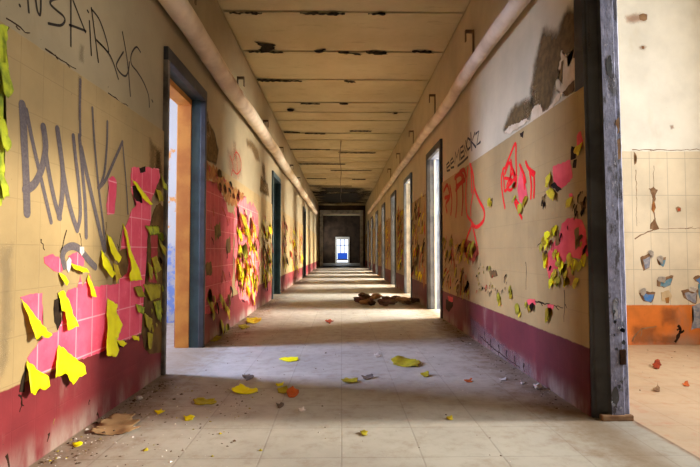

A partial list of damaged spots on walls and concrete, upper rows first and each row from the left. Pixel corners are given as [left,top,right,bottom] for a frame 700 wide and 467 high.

peeling [249,42,283,54]
spalling [505,48,575,138]
crack [632,146,699,154]
peeling [539,131,588,289]
crack [634,172,696,239]
peeling [19,166,168,395]
peeling [205,162,273,334]
peeling [282,215,303,277]
peeling [442,235,536,318]
peeling [640,250,666,271]
peeling [639,275,673,303]
peeling [681,275,700,330]